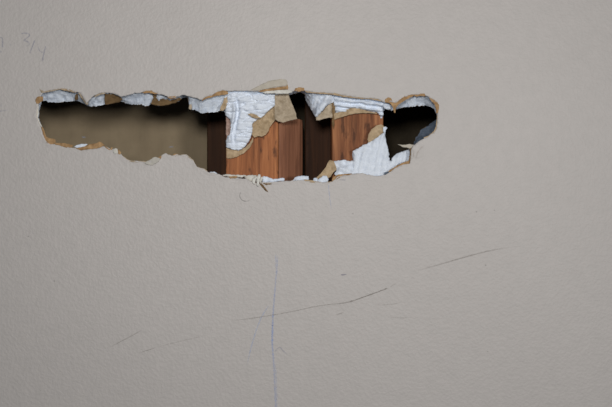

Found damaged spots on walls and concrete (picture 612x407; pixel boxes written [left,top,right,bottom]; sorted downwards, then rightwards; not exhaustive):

spalling [35,79,439,183]
spalling [223,174,285,192]